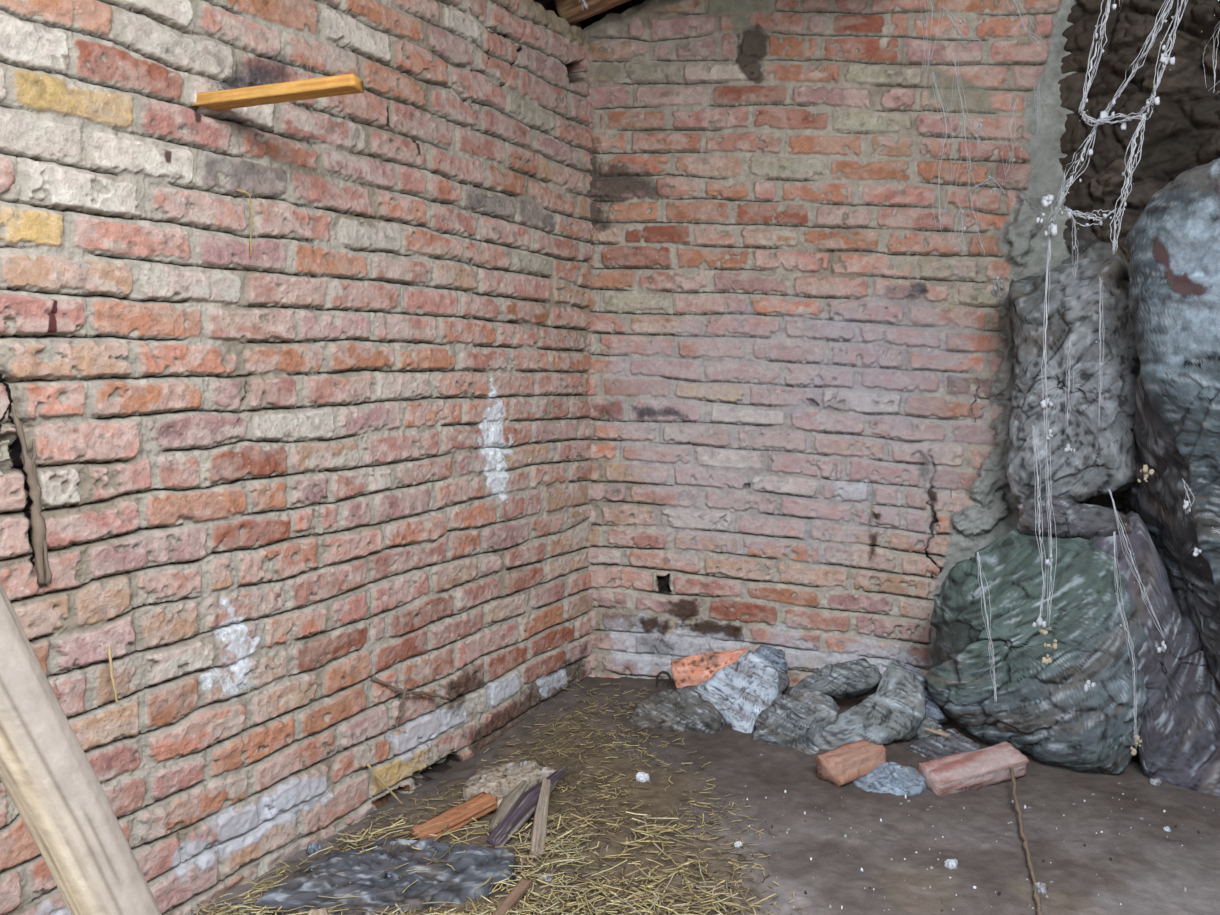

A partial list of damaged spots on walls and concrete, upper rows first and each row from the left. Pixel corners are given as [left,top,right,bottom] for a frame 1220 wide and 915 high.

crack [0,374,35,572]
water stain [477,378,514,502]
crack [912,450,952,579]
crack [971,378,980,422]
water stain [200,599,261,700]
water stain [611,599,749,675]
water stain [769,626,923,676]